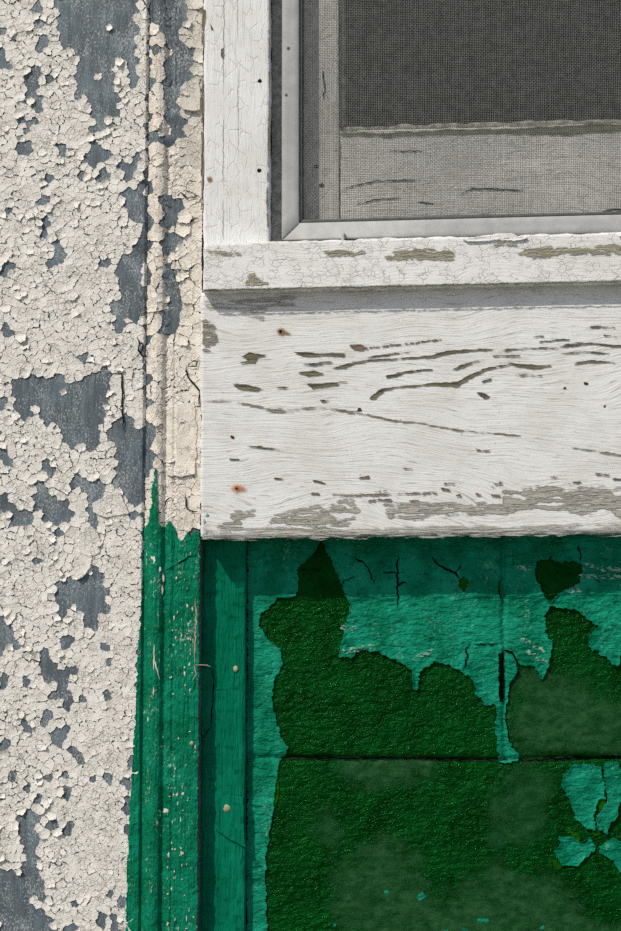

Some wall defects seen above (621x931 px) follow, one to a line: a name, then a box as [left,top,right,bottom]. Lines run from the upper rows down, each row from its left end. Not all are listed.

peeling [15,65,55,156]
peeling [30,0,296,355]
peeling [0,260,16,278]
peeling [0,352,198,666]
crack [339,555,406,606]
crack [431,556,461,578]
peeling [0,593,87,765]
crack [463,642,519,702]
peeling [215,534,621,931]
peeling [90,755,134,834]
peeling [0,770,78,931]
peeling [95,890,126,931]